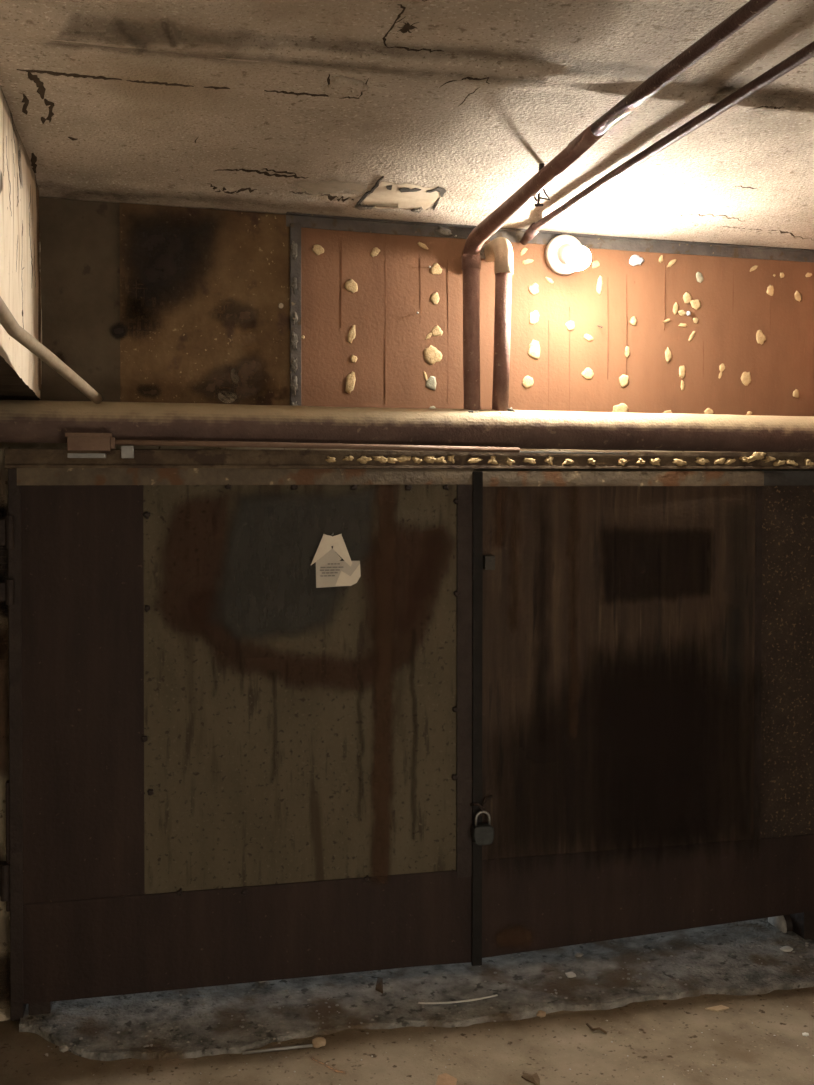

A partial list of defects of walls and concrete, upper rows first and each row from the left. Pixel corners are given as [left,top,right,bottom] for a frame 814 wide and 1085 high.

crack [17,69,230,141]
crack [264,74,369,99]
crack [207,168,354,202]
spalling [355,176,447,214]
crack [3,136,37,329]